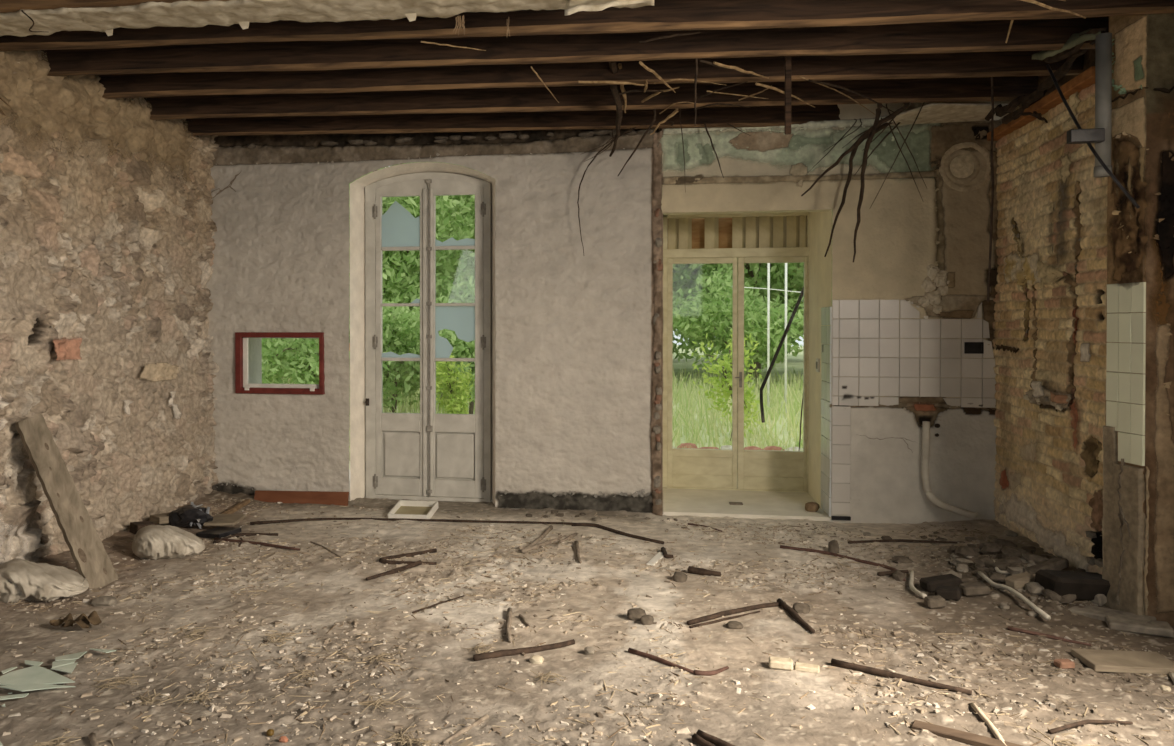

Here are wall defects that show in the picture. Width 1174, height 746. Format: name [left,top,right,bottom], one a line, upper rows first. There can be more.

peeling [1112,16,1149,150]
peeling [212,116,908,166]
peeling [906,152,1077,349]
leakage [1108,138,1174,333]
spalling [892,396,947,427]
peeling [961,405,996,415]
flaking render [1023,368,1075,413]
flaking render [496,475,662,513]
spalling [1080,436,1103,568]